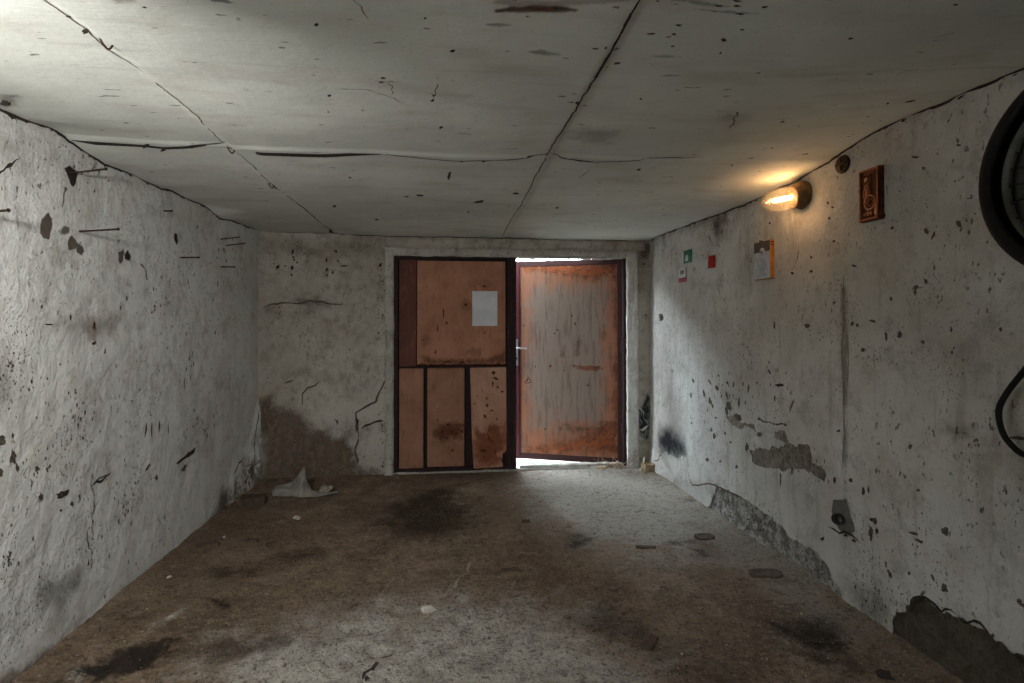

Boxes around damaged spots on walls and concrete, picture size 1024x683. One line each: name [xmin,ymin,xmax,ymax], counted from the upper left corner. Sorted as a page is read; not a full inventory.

crack [0,0,694,240]
rust [524,264,617,330]
spalling [0,433,89,512]
spalling [96,464,158,525]
damp [215,396,378,515]
crack [284,380,320,404]
crack [335,381,385,465]
rust [416,350,506,464]
rust [528,344,618,455]
spalling [690,371,836,487]
spalling [687,470,841,595]
spalling [895,574,1024,683]